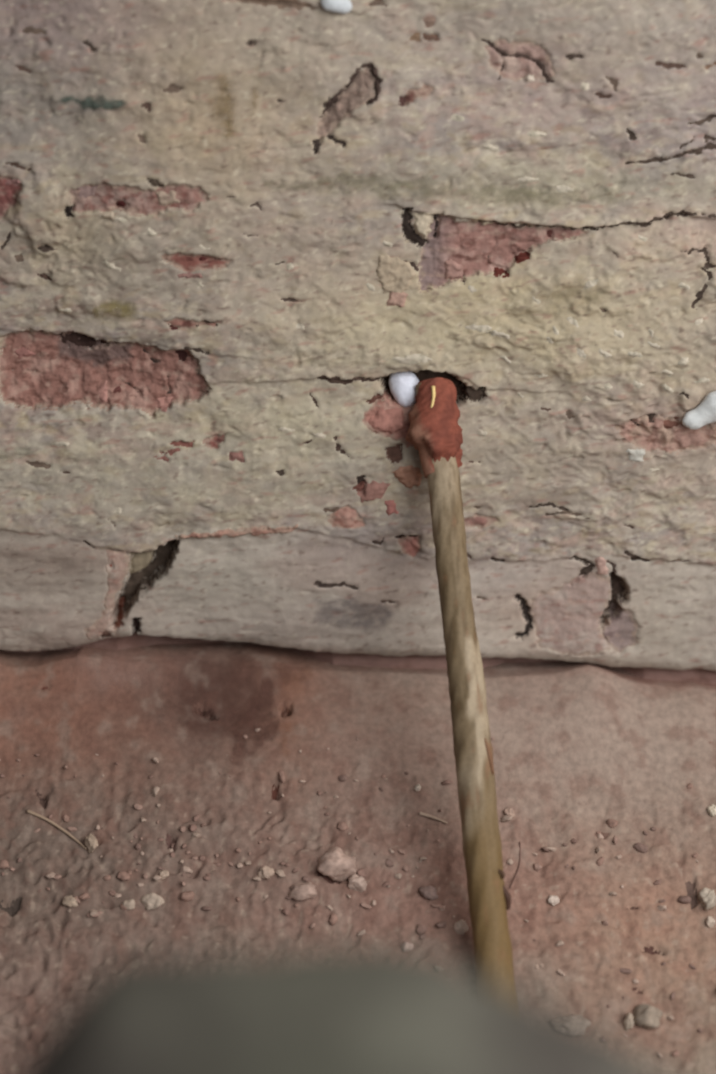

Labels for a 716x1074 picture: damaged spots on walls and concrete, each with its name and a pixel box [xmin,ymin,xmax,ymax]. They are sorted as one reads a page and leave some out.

spalling [312,63,383,155]
crack [625,114,716,179]
spalling [64,178,209,238]
crack [478,210,716,230]
spalling [366,207,603,307]
crack [681,247,716,310]
spalling [0,328,212,417]
crack [310,375,382,408]
spalling [392,354,487,404]
crack [305,436,350,457]
spalling [323,375,422,529]
spalling [530,557,612,656]